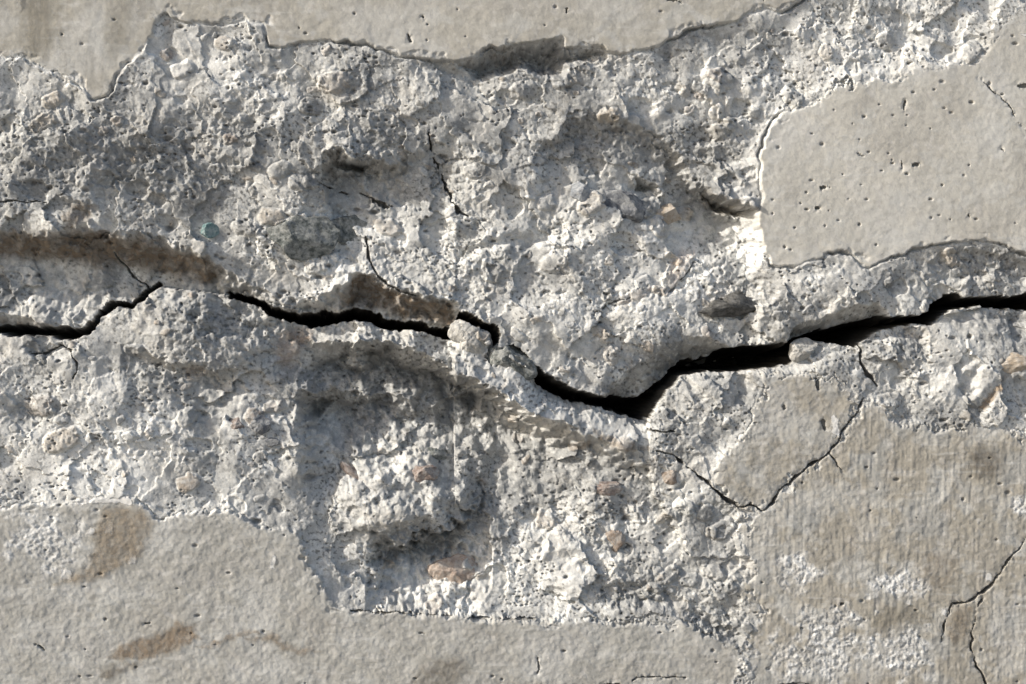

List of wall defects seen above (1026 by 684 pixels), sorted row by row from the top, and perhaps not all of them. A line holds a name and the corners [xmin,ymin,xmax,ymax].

crack [0,252,163,380]
spalling [0,0,1026,397]
spalling [0,287,1026,684]
crack [227,236,1026,512]
crack [941,542,1024,684]